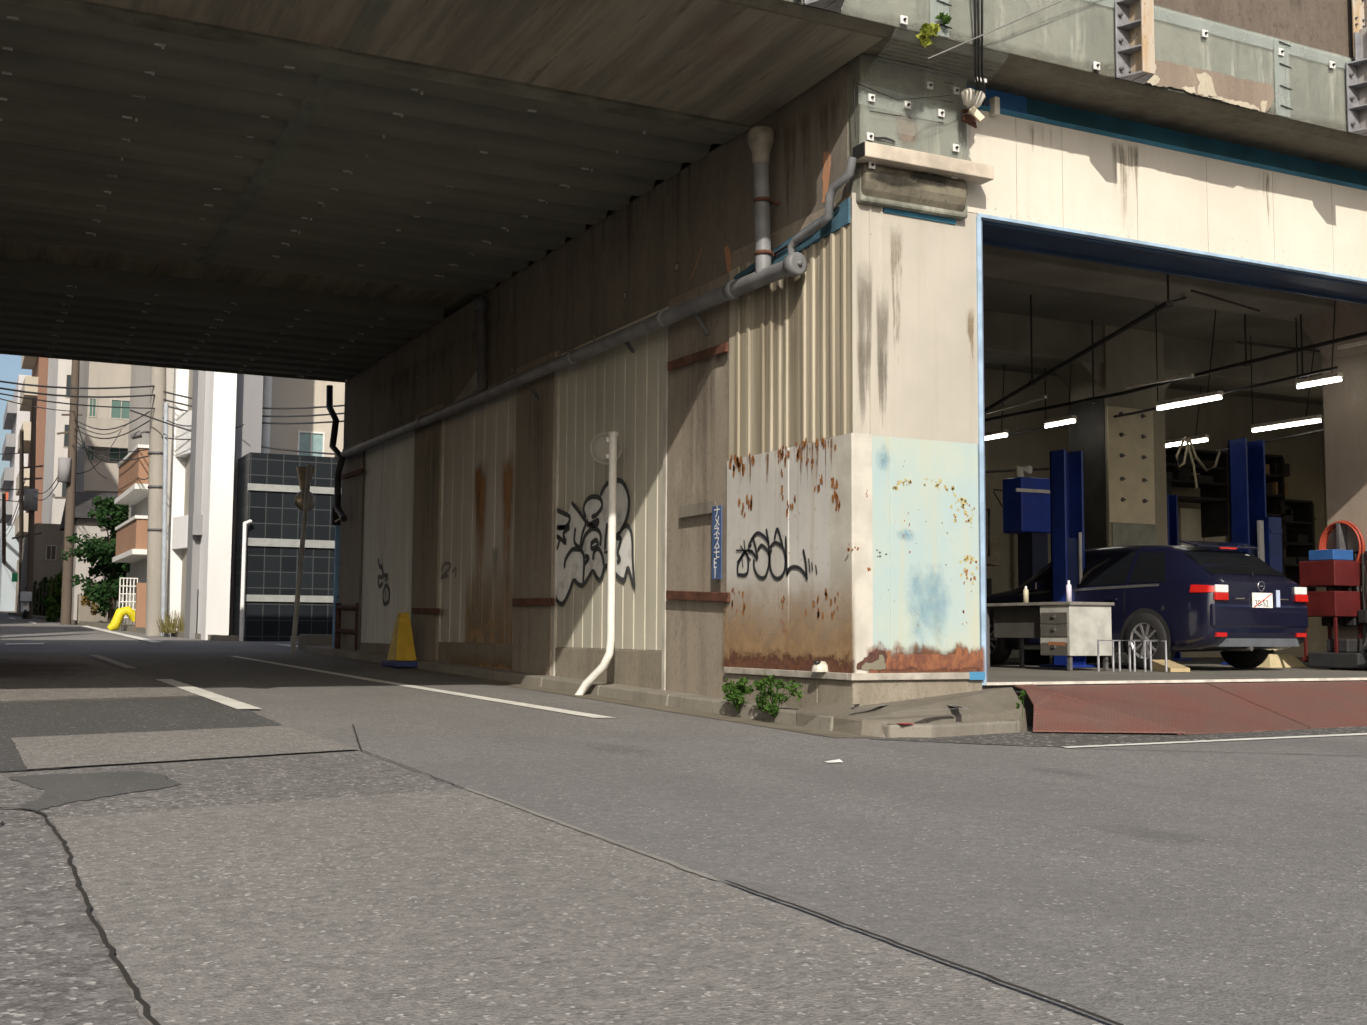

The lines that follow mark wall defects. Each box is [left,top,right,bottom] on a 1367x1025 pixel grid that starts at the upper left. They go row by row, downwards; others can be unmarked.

rust [729,436,840,518]